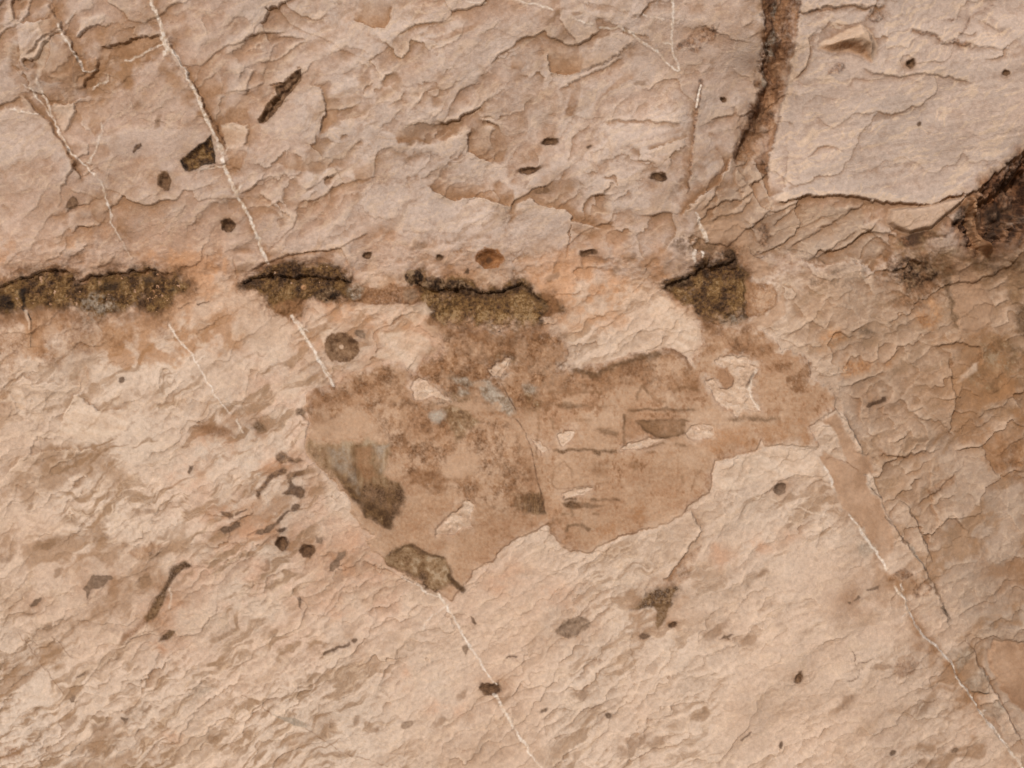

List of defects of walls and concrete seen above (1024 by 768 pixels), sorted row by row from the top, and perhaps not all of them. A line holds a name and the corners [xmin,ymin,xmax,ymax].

crack [56,0,270,266]
damp [0,253,207,420]
crack [167,300,245,434]
crack [289,314,336,388]
damp [226,229,901,532]
damp [380,541,467,595]
crack [401,576,543,768]
crack [710,407,1024,768]